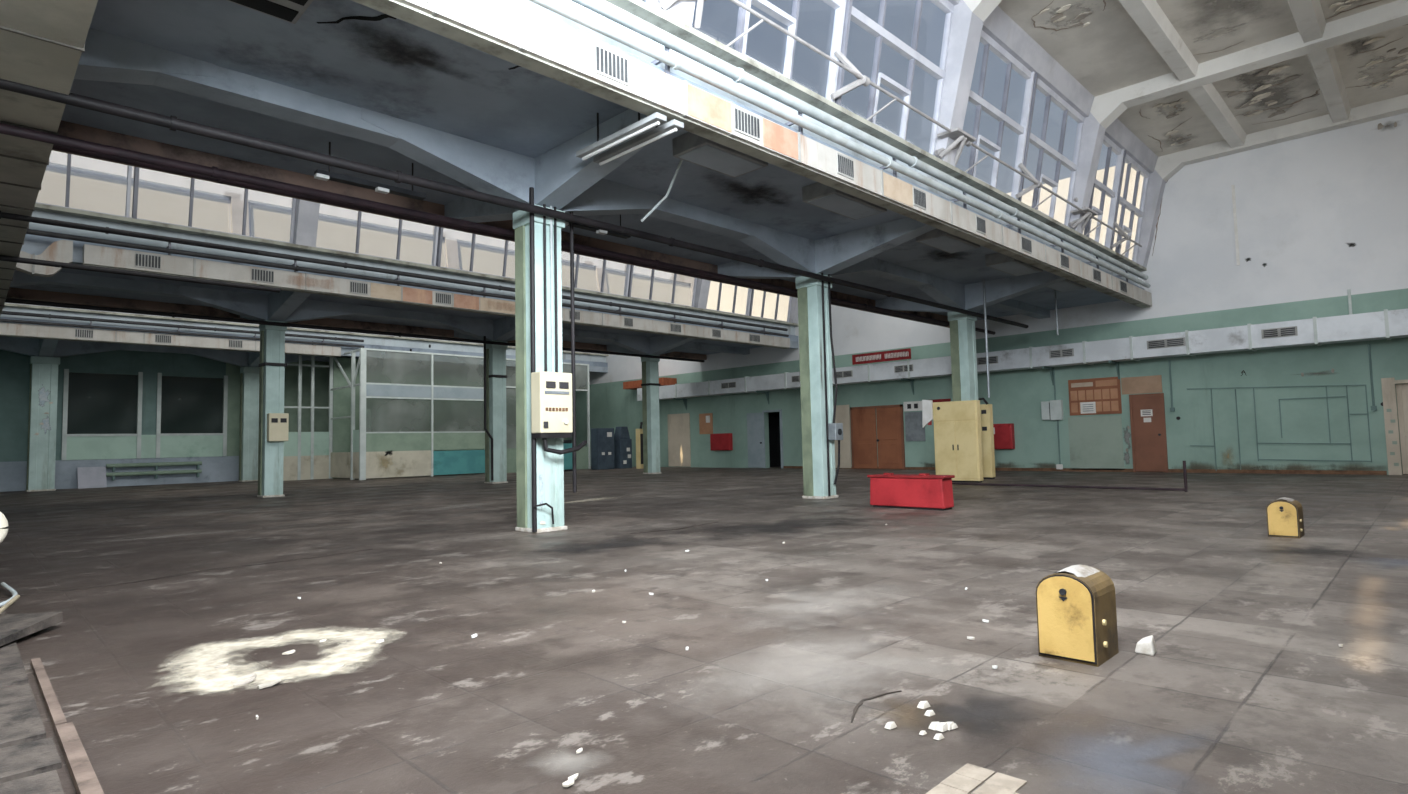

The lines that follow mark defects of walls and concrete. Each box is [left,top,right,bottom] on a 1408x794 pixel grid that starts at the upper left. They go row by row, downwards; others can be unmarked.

spalling [1032,0,1106,31]
peeling [1347,24,1408,88]
peeling [1226,59,1320,125]